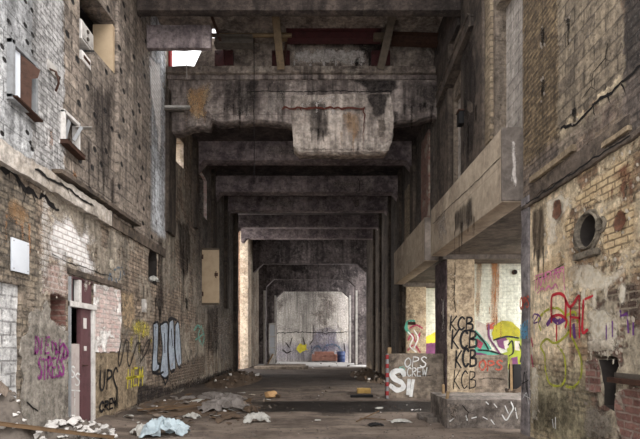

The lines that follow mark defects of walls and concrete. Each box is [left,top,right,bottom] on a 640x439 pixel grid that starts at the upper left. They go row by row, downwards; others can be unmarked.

water stain [311,96,335,140]
water stain [354,80,397,116]
crack [561,43,640,129]
crack [0,166,95,211]
water stain [454,200,472,248]
water stain [532,209,544,279]
peeling [19,190,139,431]
rust [489,264,499,326]
spalling [614,387,640,439]